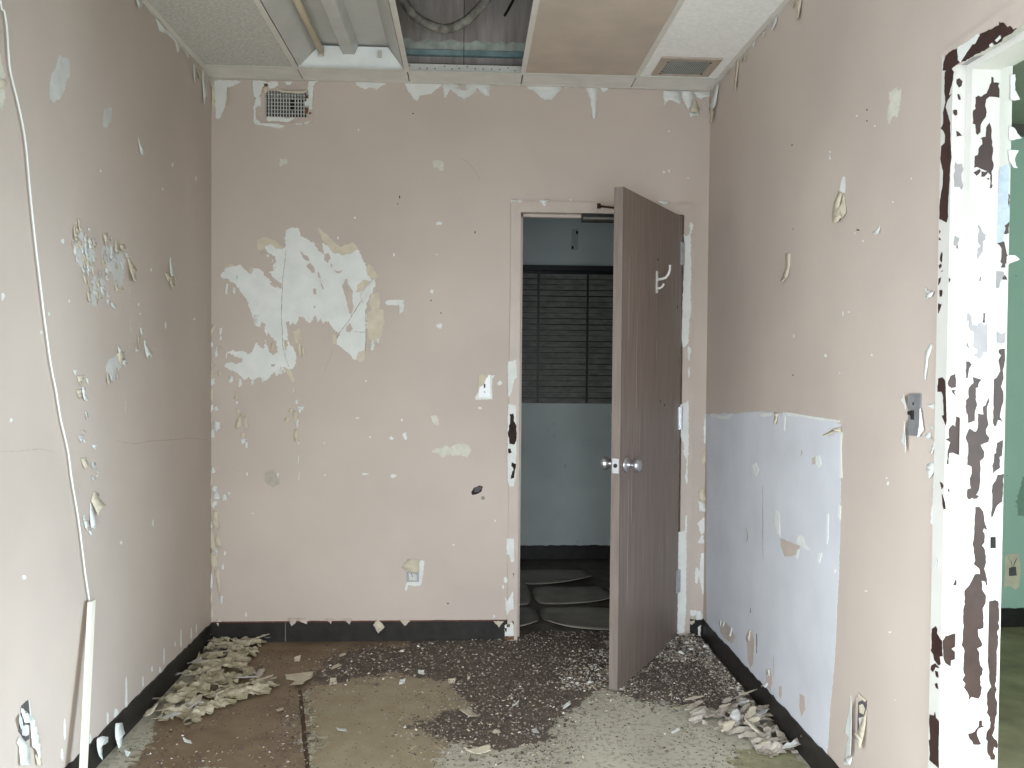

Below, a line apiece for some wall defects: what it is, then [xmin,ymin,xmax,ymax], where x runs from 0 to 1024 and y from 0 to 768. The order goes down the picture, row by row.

peeling [61,218,137,310]
peeling [211,227,405,480]
peeling [405,83,490,101]
peeling [498,360,517,486]
peeling [527,86,570,100]
peeling [586,88,608,119]
peeling [681,222,693,378]
peeling [832,177,846,224]
peeling [925,0,1024,313]
peeling [210,467,230,625]
peeling [677,401,842,753]
peeling [924,313,1006,768]